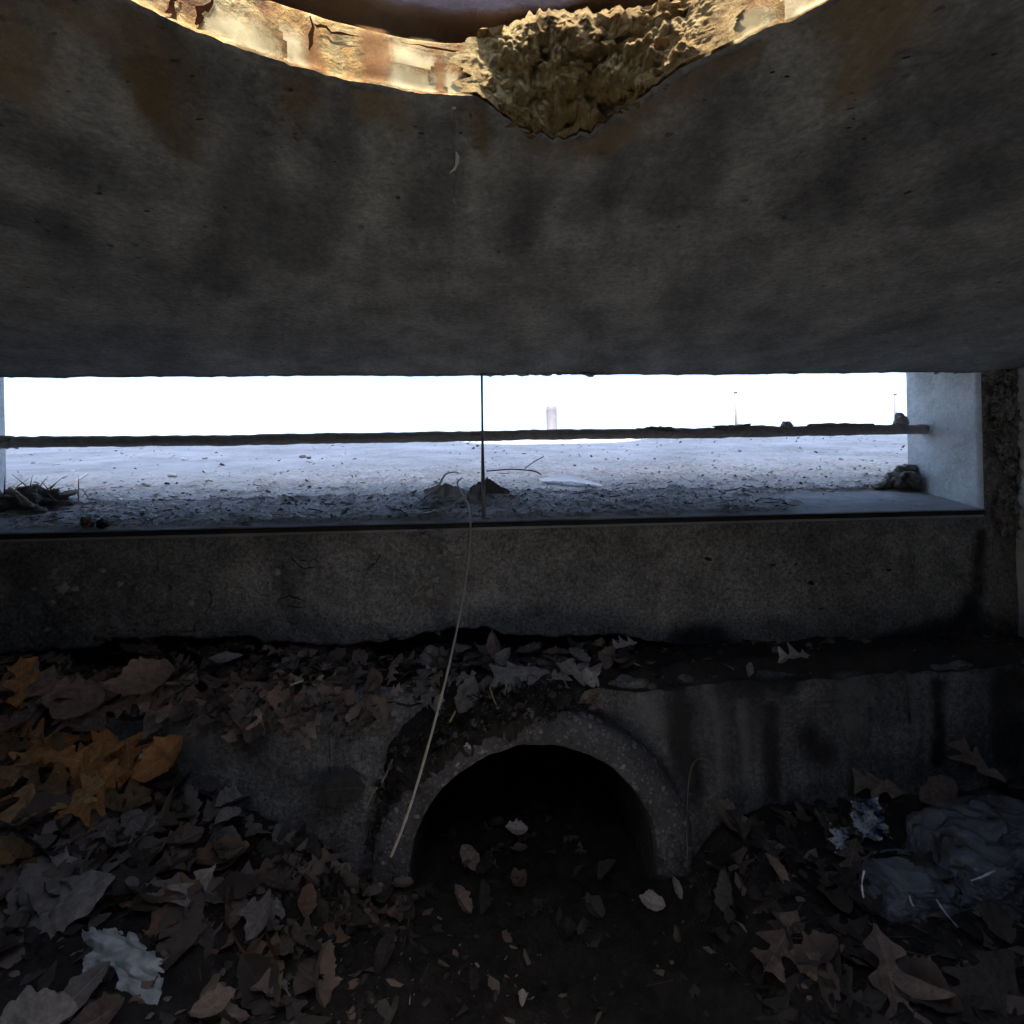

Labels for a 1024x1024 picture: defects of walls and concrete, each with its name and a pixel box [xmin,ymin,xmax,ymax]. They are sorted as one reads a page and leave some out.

rust [304,27,325,71]
rust [361,27,390,82]
spalling [449,0,747,139]
leakage [635,682,702,805]
leakage [723,676,799,800]